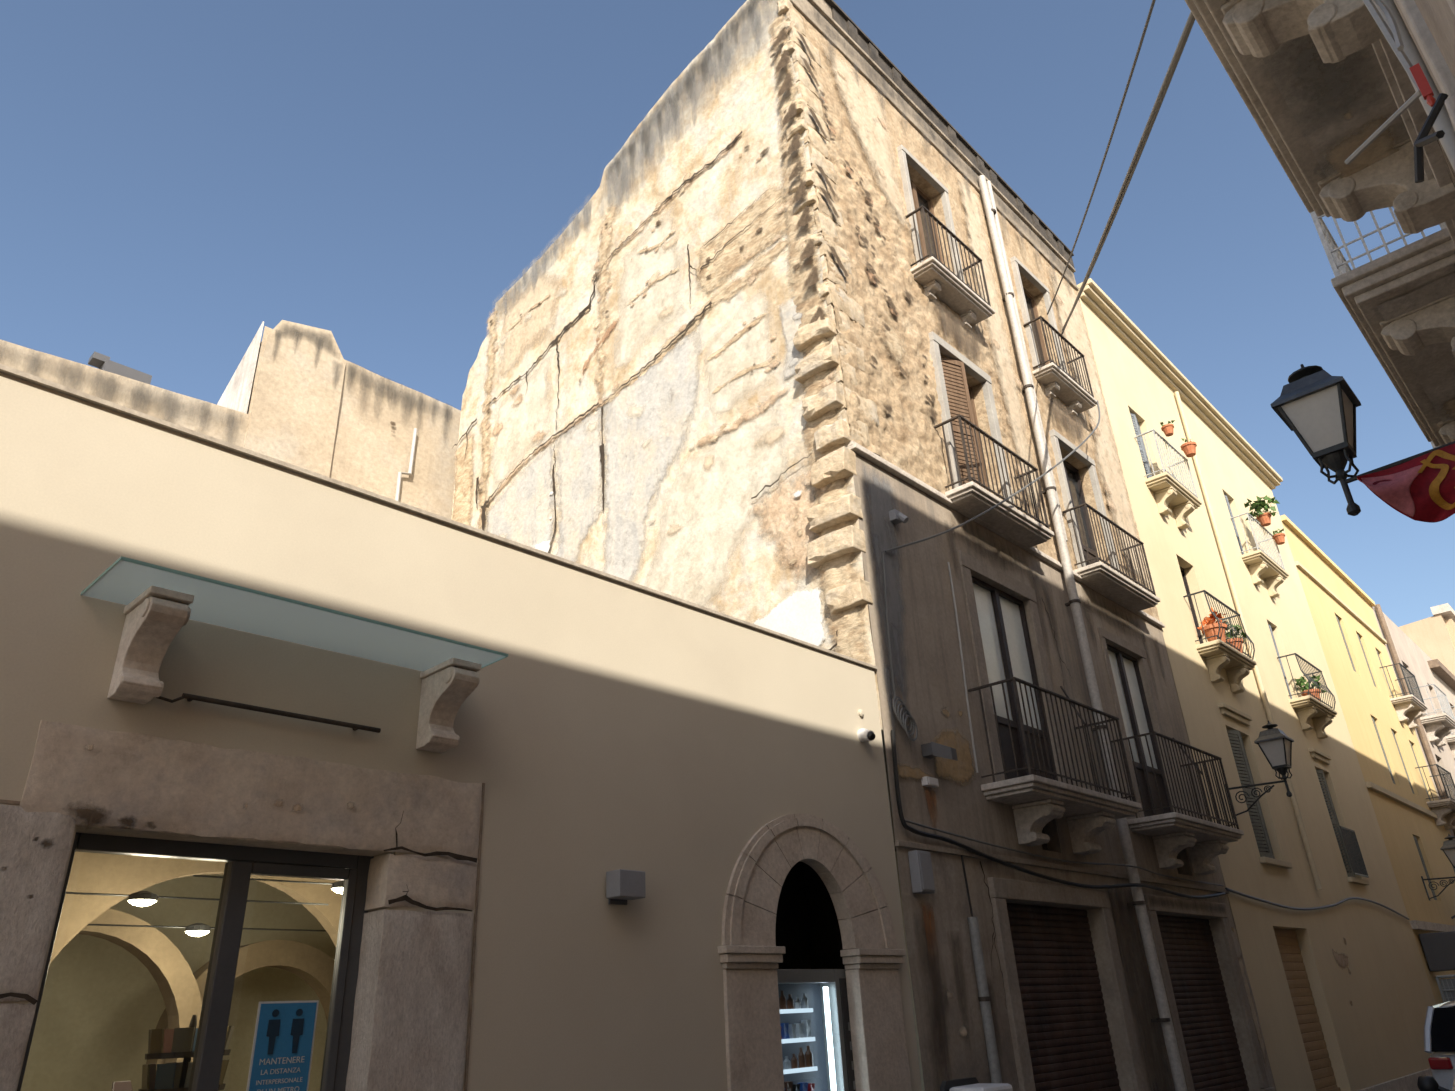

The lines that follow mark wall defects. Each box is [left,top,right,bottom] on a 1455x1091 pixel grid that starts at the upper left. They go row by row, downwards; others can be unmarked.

water stain [608,0,772,199]
water stain [277,328,331,351]
crack [453,272,597,553]
crack [598,406,606,510]
flaking render [452,11,849,529]
crack [687,244,699,304]
flaking render [689,367,869,662]
flaking render [850,168,937,419]
crack [384,811,477,911]
crack [0,992,38,1005]